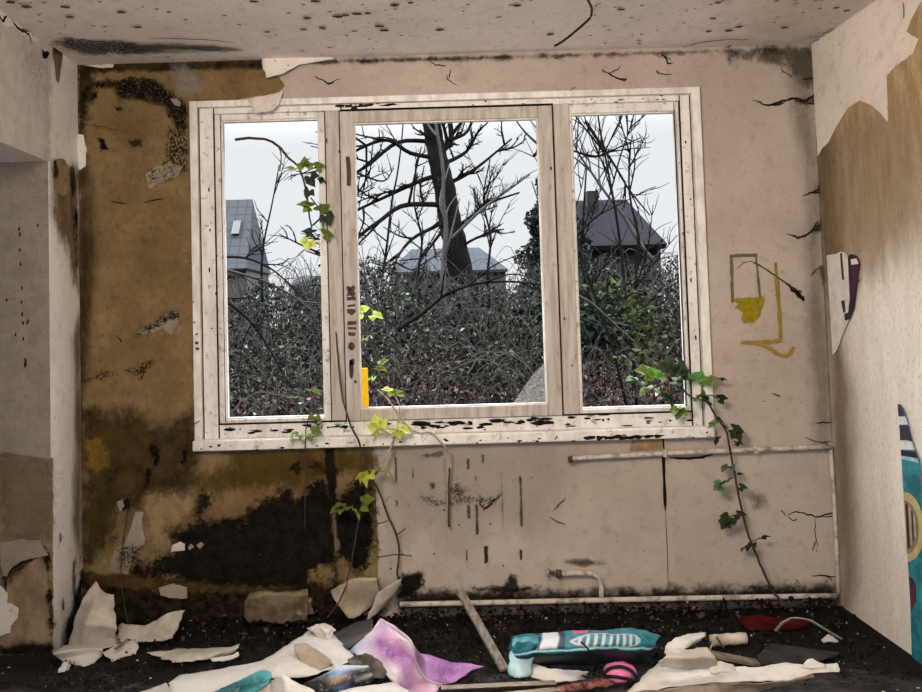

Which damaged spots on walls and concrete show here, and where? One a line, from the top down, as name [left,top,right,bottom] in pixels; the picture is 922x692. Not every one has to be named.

damp [52,6,262,173]
crack [753,63,814,106]
crack [788,221,823,239]
crack [803,186,821,196]
damp [819,2,922,315]
flaking render [0,453,56,656]
flaking render [53,60,384,599]
damp [54,167,386,644]
peeling [411,414,611,444]
flaking render [572,425,664,451]
damp [397,343,851,615]
crack [781,510,833,549]